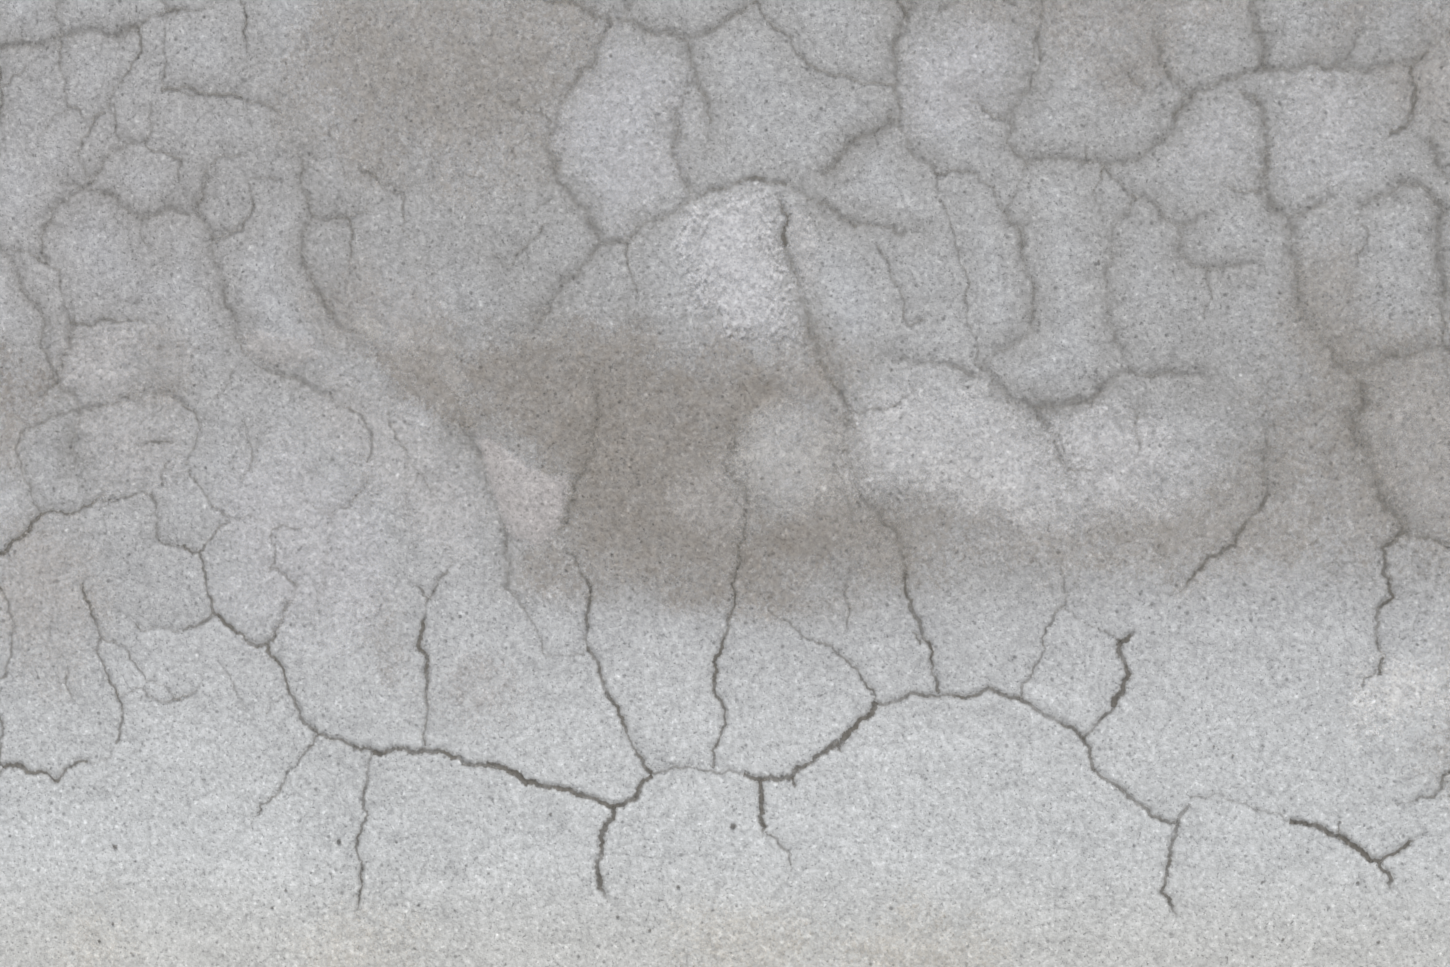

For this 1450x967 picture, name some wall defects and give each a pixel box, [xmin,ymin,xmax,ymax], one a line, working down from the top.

leakage [276,0,677,203]
crack [719,176,790,246]
leakage [313,244,1450,621]
crack [0,500,95,555]
crack [82,584,96,620]
crack [1186,495,1267,585]
crack [1376,530,1405,675]
crack [0,667,122,783]
crack [183,544,653,904]
crack [711,555,1047,831]
crack [1060,633,1179,907]
crack [1289,818,1412,883]